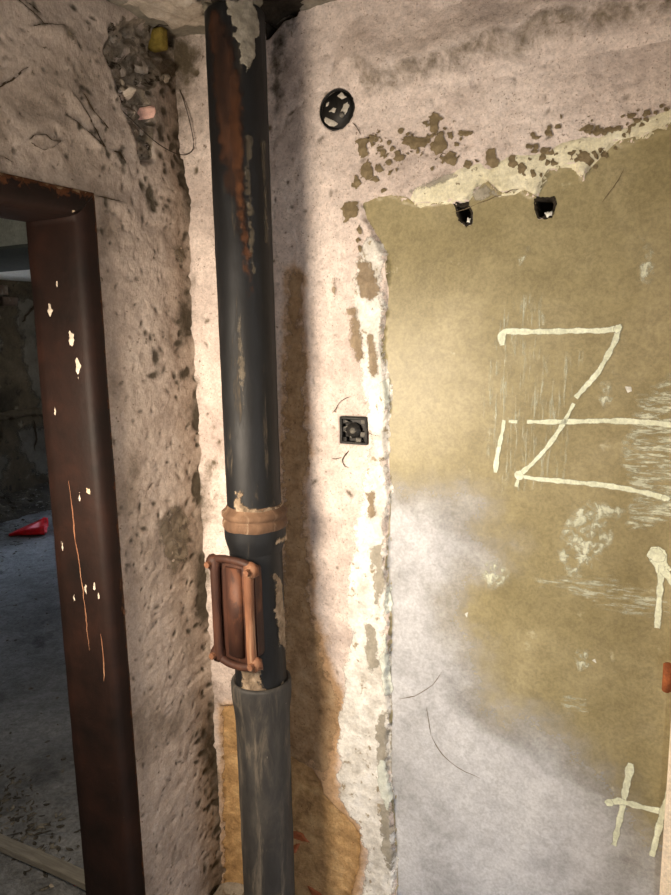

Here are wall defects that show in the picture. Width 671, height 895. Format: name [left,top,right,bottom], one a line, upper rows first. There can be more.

crack [0,67,28,87]
crack [19,0,63,26]
crack [72,93,126,161]
flaking render [103,0,205,162]
corrosion [209,11,251,257]
flaking render [260,0,304,40]
peeling [234,104,671,895]
flaking render [209,705,243,895]